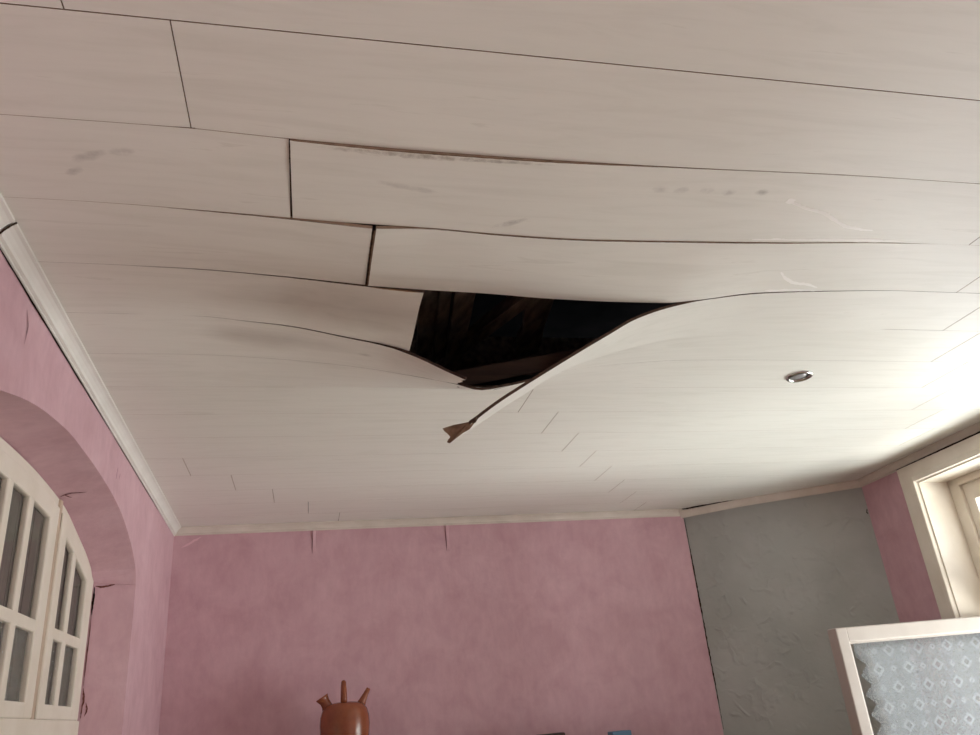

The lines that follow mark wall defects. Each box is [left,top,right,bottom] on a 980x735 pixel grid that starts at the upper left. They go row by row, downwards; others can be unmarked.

crack [0,222,156,506]
peeling [443,422,474,443]
crack [83,584,115,685]